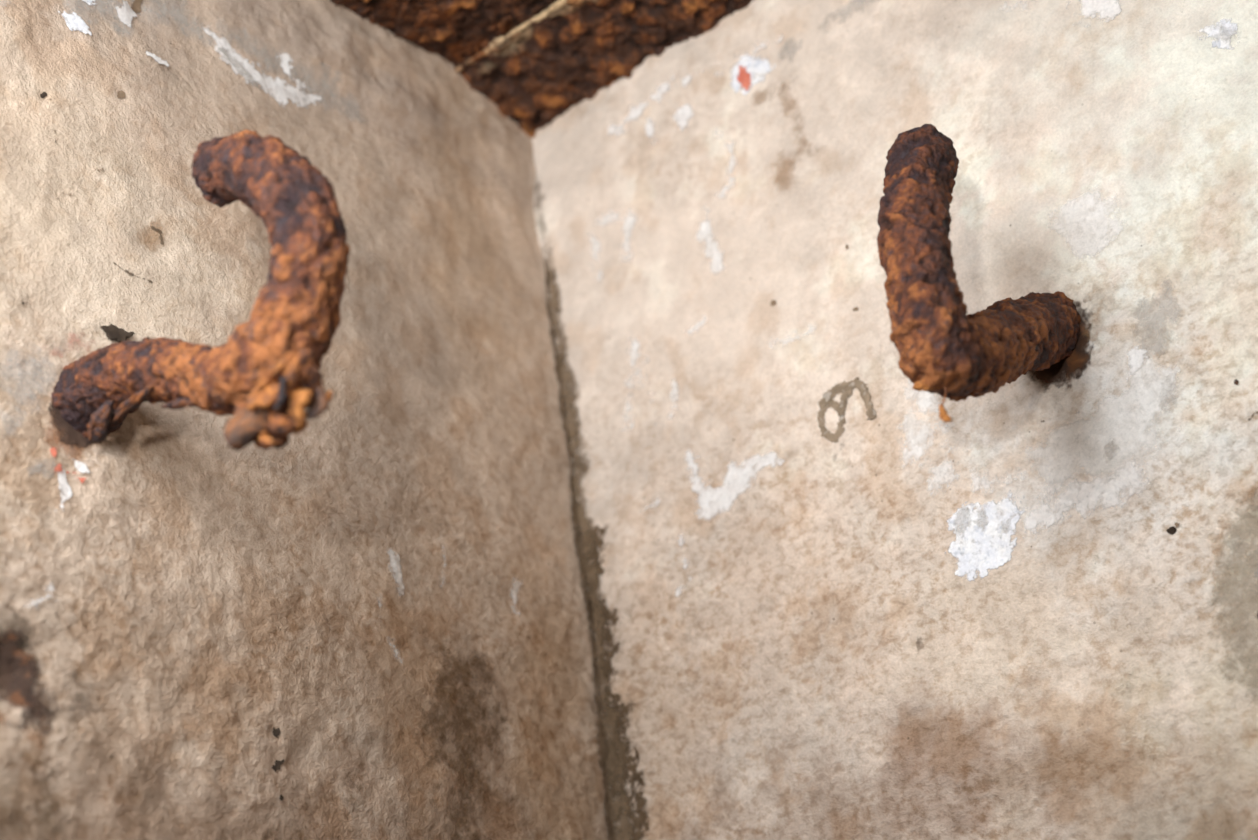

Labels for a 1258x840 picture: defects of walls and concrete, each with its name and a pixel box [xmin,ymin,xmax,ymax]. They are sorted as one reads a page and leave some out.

rust [886,294,898,314]
rust [48,383,156,452]
rust [223,349,334,451]
rust [912,376,940,391]
rust [939,404,952,423]
rust [981,361,997,392]
rust [1029,302,1093,387]
peeling [947,462,1147,581]
rust [0,621,55,732]